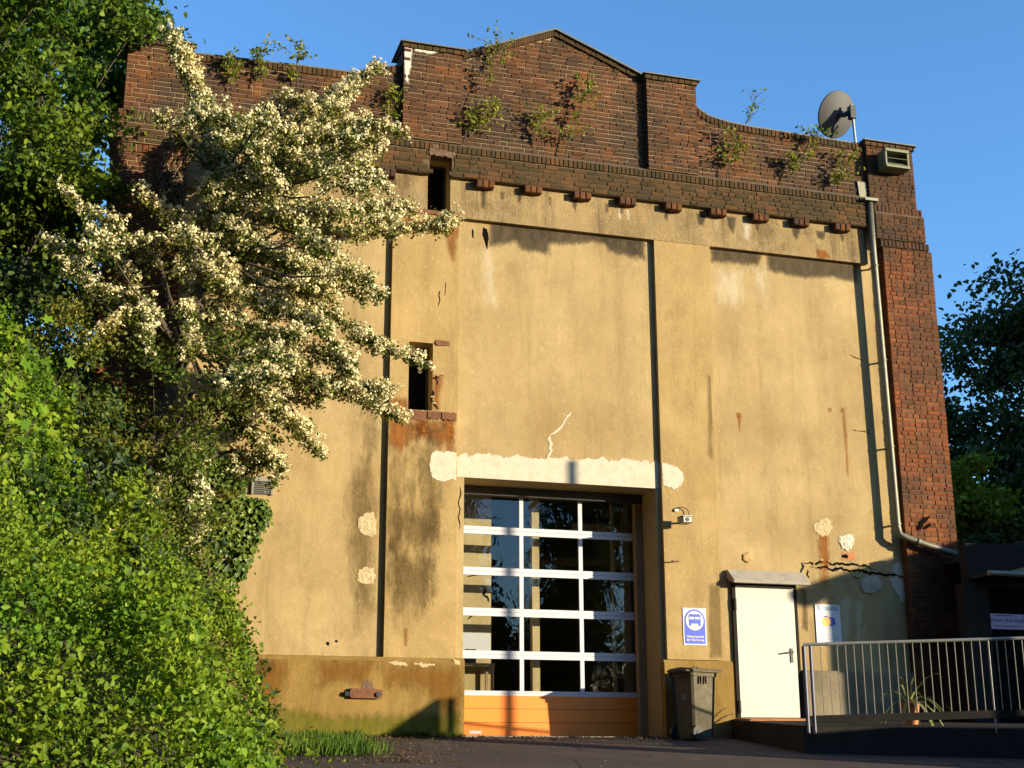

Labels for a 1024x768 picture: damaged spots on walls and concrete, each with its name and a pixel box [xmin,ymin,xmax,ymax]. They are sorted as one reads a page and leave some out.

rust [389,421,454,452]
crack [547,411,571,461]
peeling [357,512,377,537]
spalling [813,517,856,560]
peeling [356,567,376,584]
rust [819,536,829,583]
crack [800,559,903,579]
leakage [271,708,458,736]